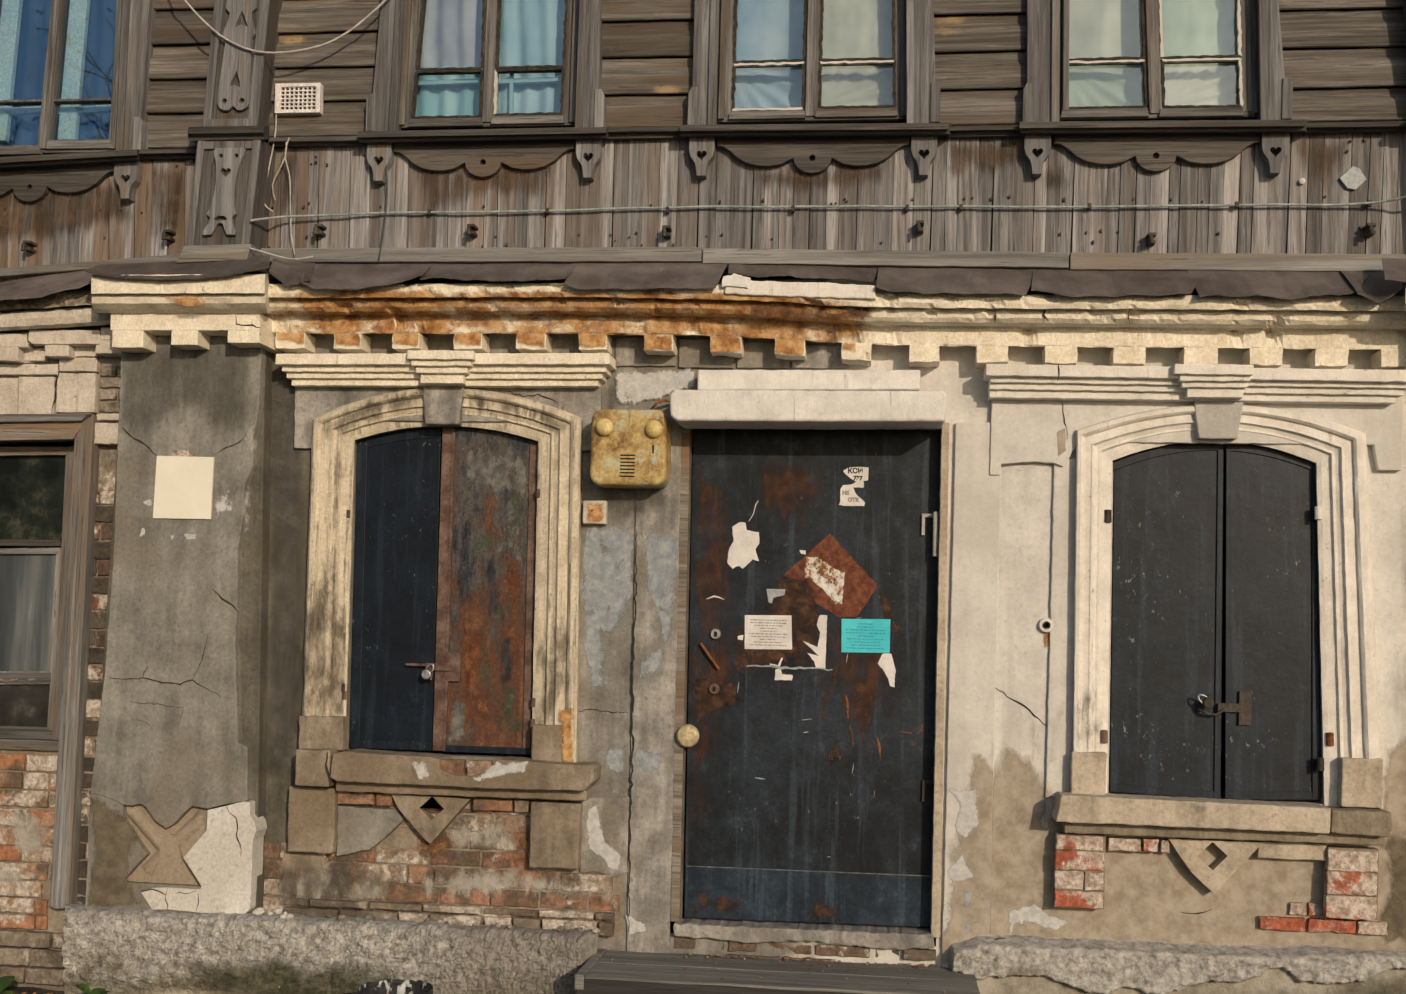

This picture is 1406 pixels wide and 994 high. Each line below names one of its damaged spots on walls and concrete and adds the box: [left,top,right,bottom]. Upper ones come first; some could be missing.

rust [273,289,871,355]
peeling [580,525,678,687]
rust [692,534,900,725]
crack [112,636,218,730]
crack [579,530,637,931]
peeling [601,748,661,776]
crack [996,688,1047,726]
peeling [950,789,978,837]
flaking render [85,794,646,939]
peeling [943,856,973,933]
peeling [1008,905,1069,935]